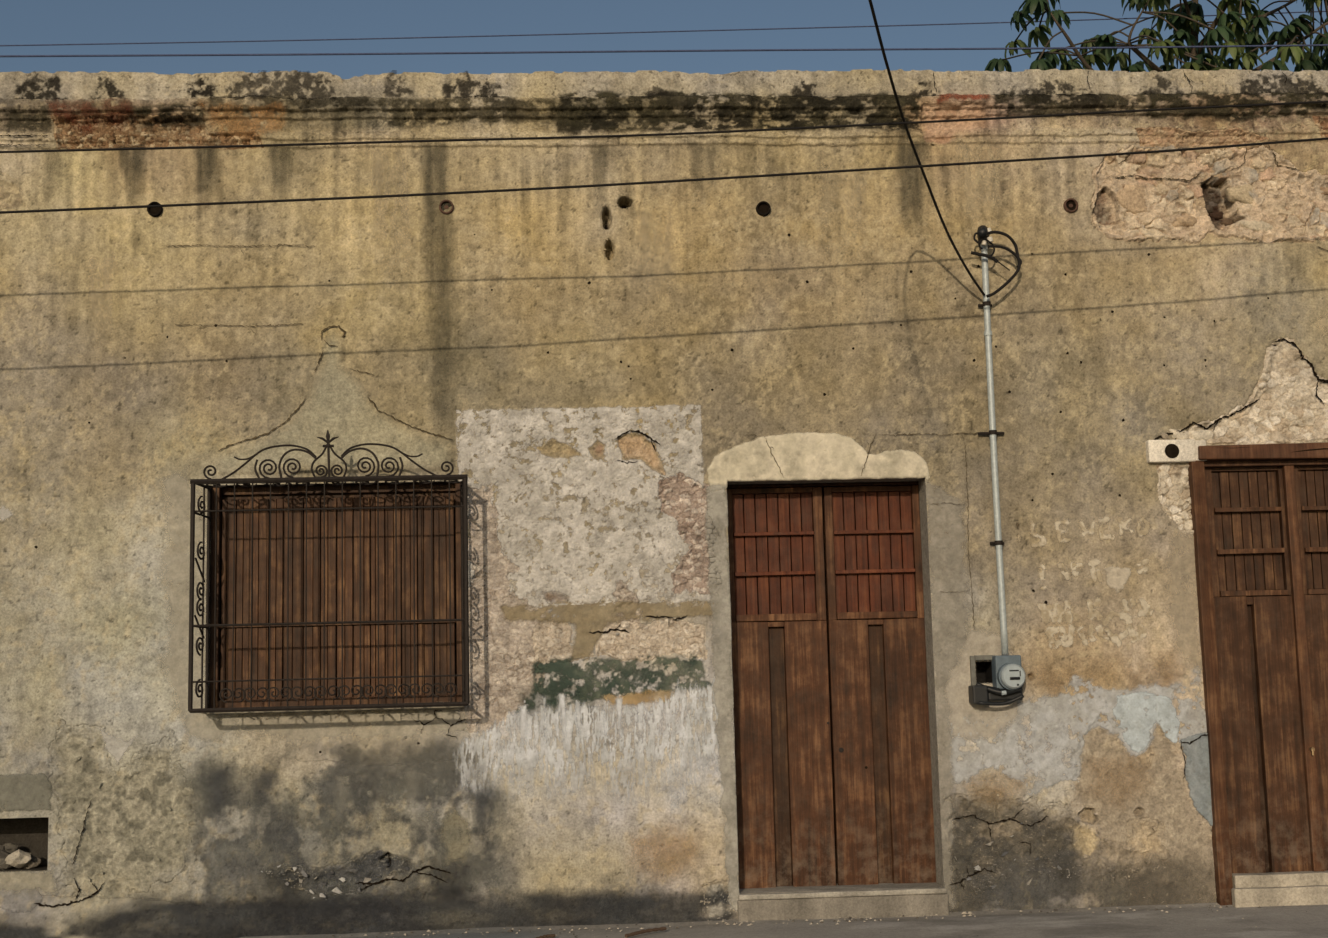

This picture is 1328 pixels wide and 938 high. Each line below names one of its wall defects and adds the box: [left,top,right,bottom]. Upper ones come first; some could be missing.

flaking render [1091,145,1328,244]
flaking render [1183,337,1328,445]
flaking render [535,432,710,596]
flaking render [1156,463,1194,534]
flaking render [459,483,708,733]
flaking render [261,849,418,900]
leakage [0,763,733,938]
peeling [940,713,1217,905]